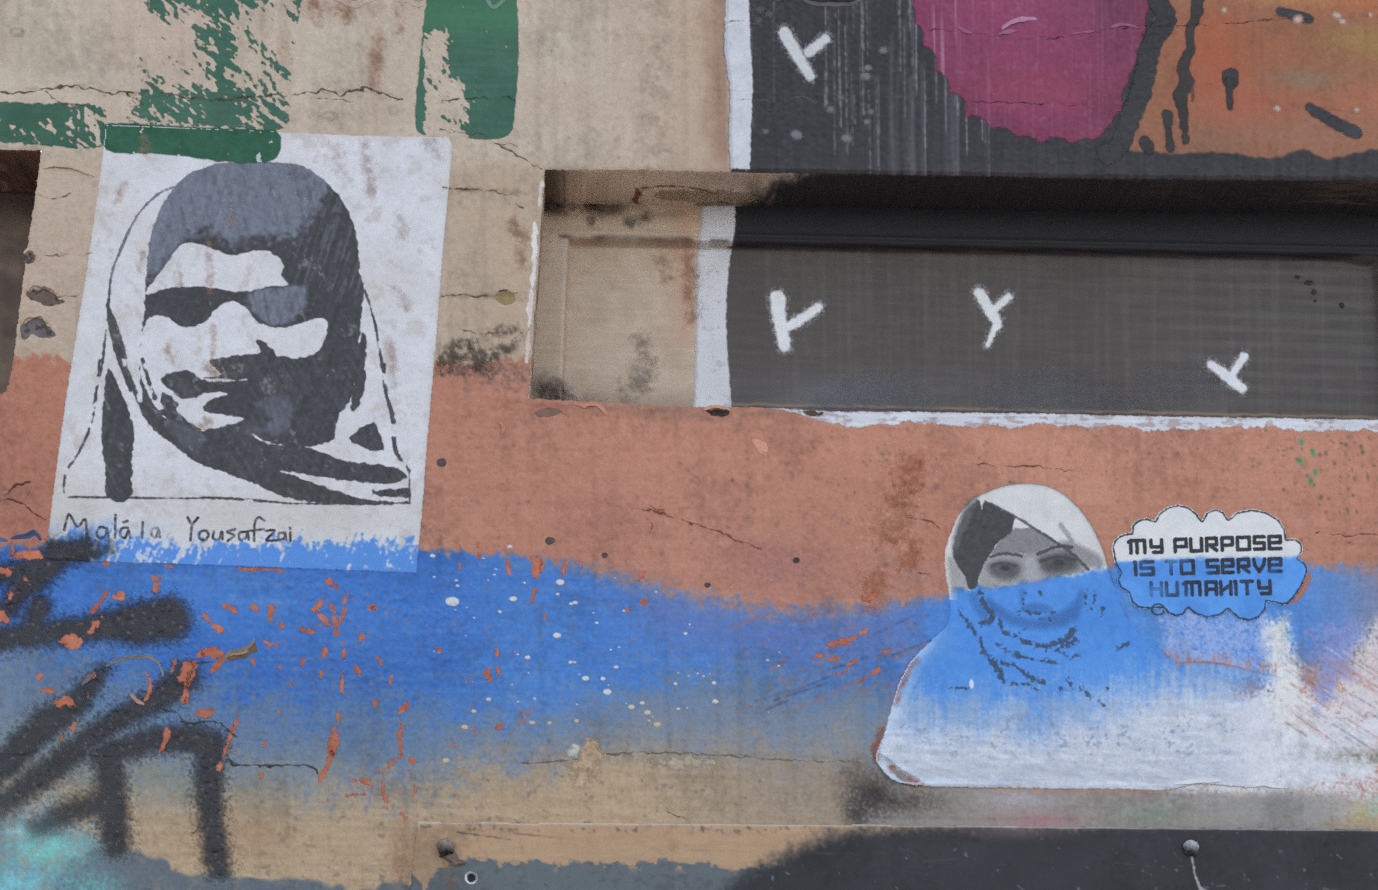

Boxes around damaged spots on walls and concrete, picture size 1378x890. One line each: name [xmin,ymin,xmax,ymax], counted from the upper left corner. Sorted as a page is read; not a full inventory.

crack [0,85,403,105]
spalling [24,245,41,264]
spalling [20,279,64,340]